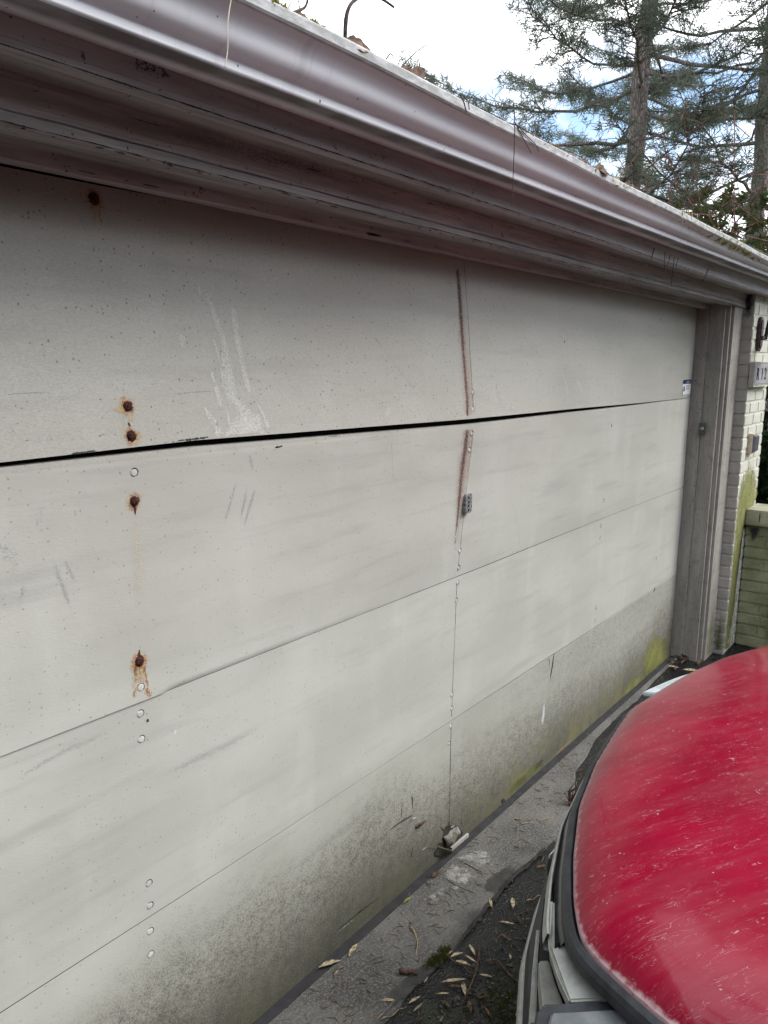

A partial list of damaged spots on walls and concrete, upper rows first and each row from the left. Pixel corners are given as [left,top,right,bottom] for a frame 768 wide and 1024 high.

rust [456,268,474,416]
rust [113,392,144,447]
rust [454,428,473,543]
rust [130,648,152,697]
damp [483,864,515,893]